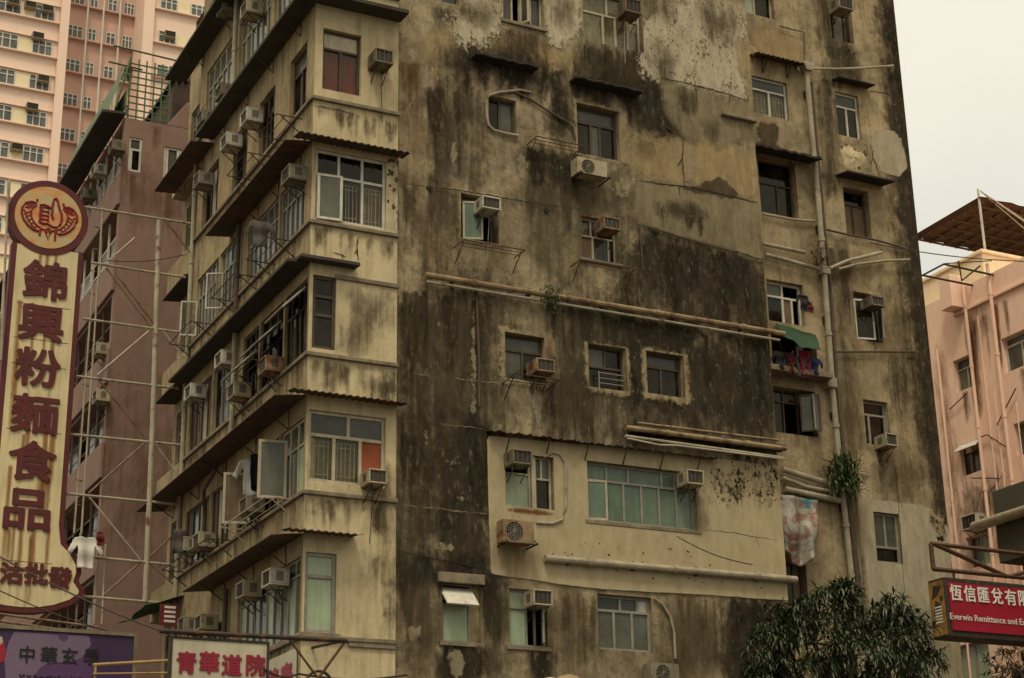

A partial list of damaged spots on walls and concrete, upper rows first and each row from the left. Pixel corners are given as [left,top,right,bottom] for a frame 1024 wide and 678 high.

flaking render [424,0,600,71]
peeling [634,0,803,106]
crack [635,137,758,203]
water stain [371,31,681,678]
water stain [518,143,782,504]